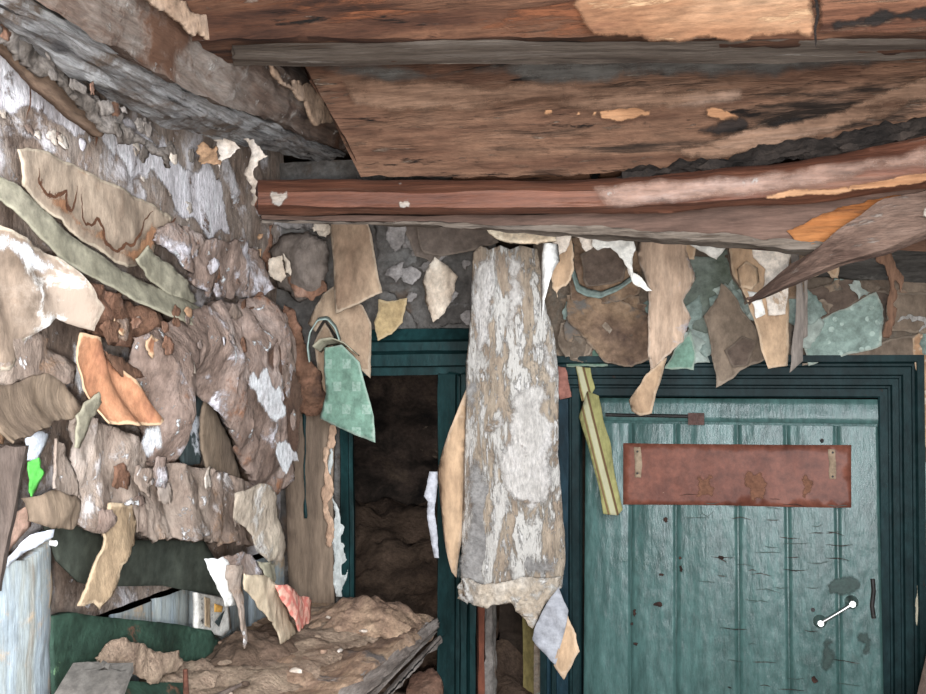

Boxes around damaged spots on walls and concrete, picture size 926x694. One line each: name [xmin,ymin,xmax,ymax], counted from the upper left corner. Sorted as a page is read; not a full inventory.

flaking render [0,23,330,321]
flaking render [487,230,593,255]
flaking render [82,282,193,358]
flaking render [374,225,496,352]
peeling [507,258,524,327]
peeling [788,279,885,349]
spalling [74,346,83,392]
flaking render [68,417,255,547]
spalling [250,367,286,421]
spalling [276,440,298,474]
flaking render [282,304,326,416]
peeling [485,347,556,508]